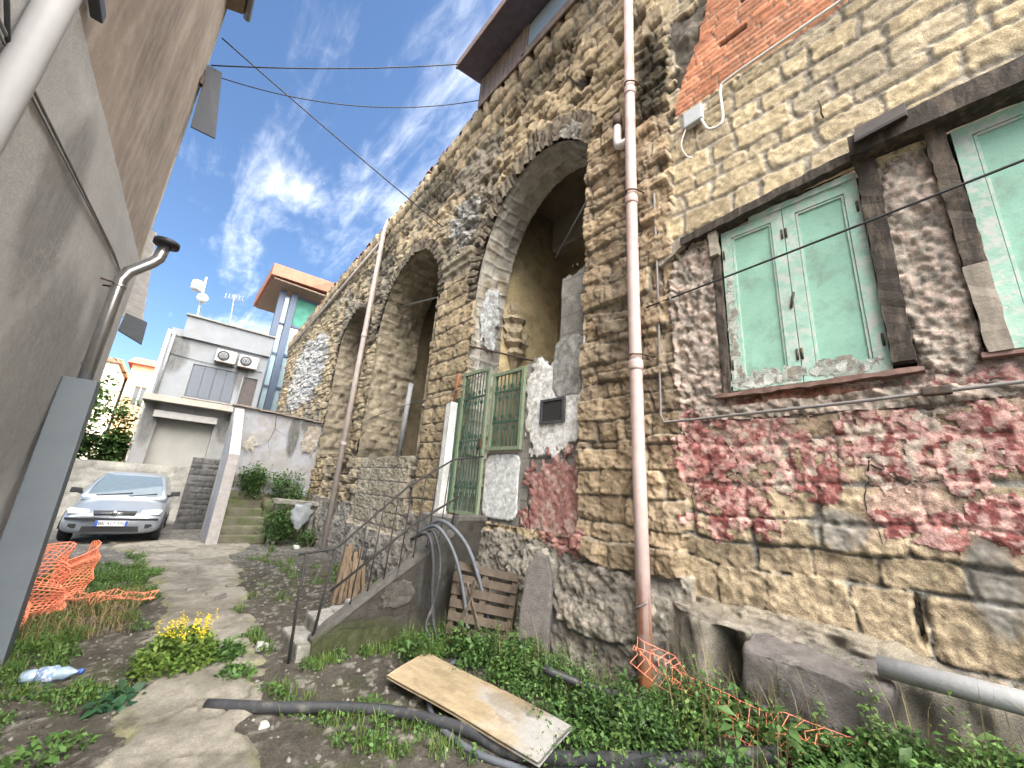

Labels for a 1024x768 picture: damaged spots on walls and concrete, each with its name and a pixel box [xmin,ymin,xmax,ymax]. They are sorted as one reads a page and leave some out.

spalling [663,147,1024,559]
peeling [518,356,585,560]
crack [853,419,939,544]